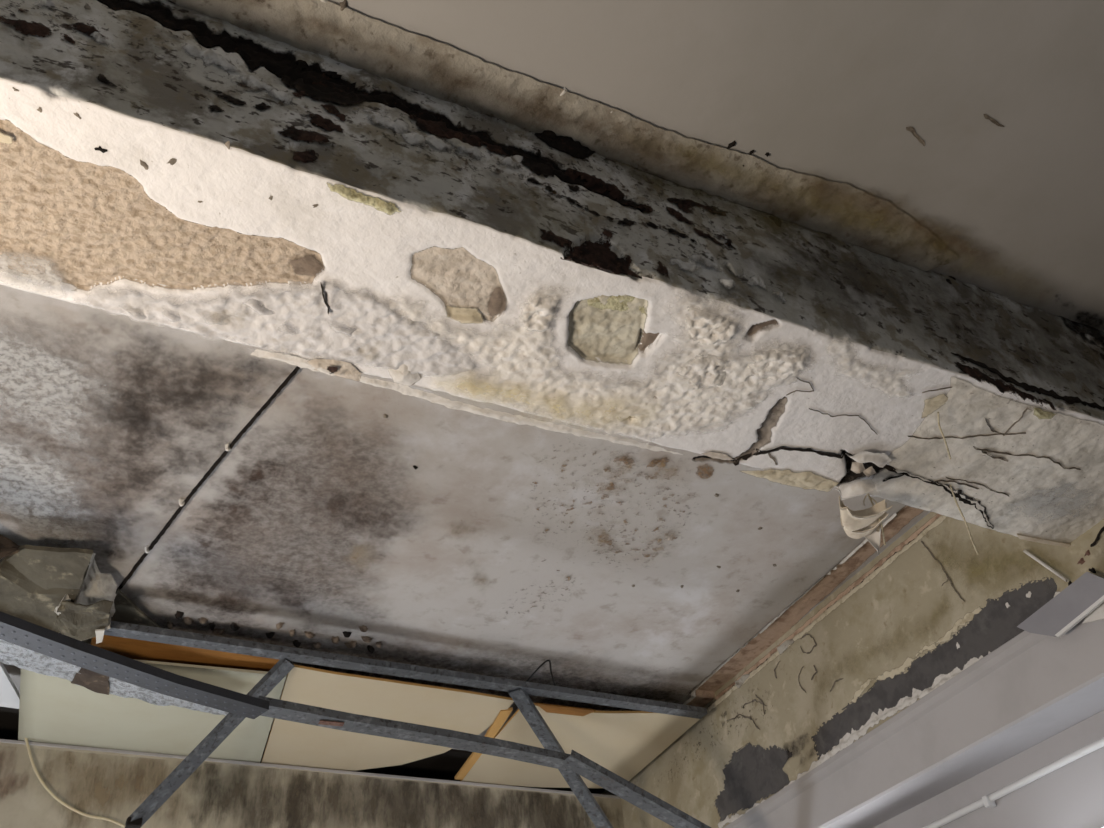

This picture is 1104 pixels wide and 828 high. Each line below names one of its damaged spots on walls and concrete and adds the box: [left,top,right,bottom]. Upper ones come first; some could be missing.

spalling [0,120,324,295]
spalling [411,246,507,324]
spalling [568,295,659,364]
leakage [0,334,238,556]
crack [115,366,300,594]
leakage [166,427,393,614]
leakage [537,450,690,564]
crack [692,377,877,466]
crack [883,465,1009,529]
crack [908,352,1104,470]
peeling [714,577,1060,828]
leakage [205,766,593,828]